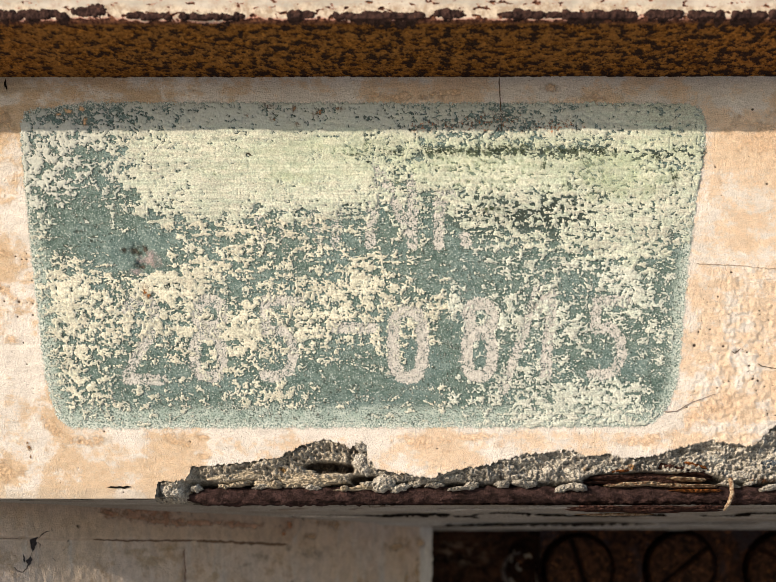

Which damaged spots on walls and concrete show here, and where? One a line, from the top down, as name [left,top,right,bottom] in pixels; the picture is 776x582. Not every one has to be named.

peeling [0,0,776,24]
corrosion [501,8,776,30]
peeling [20,95,707,446]
spalling [155,425,776,511]
crack [323,510,776,527]
crack [0,528,52,573]
crack [93,539,288,582]